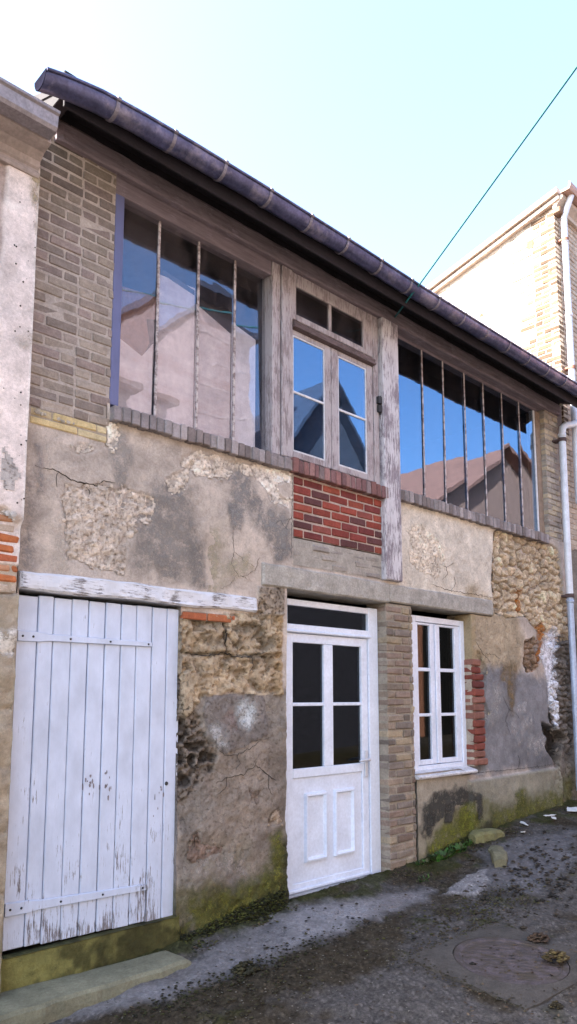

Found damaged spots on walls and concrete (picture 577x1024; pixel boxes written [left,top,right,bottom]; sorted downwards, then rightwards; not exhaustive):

flaking render [0,440,27,593]
crack [35,465,114,495]
peeling [61,483,156,575]
peeling [165,450,292,509]
spalling [491,531,574,756]
leakage [536,629,560,729]
crack [217,737,275,793]
leakage [421,787,483,837]